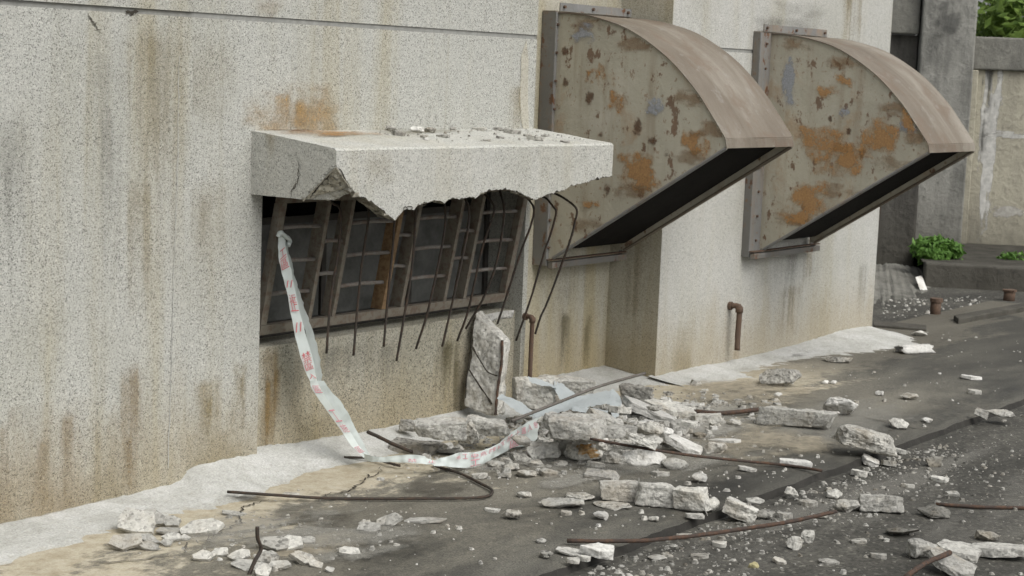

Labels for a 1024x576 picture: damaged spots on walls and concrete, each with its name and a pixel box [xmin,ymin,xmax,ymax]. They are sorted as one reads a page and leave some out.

corrosion [681,131,710,156]
crack [290,161,348,199]
corrosion [617,152,661,192]
corrosion [779,107,915,224]
spalling [303,167,605,361]